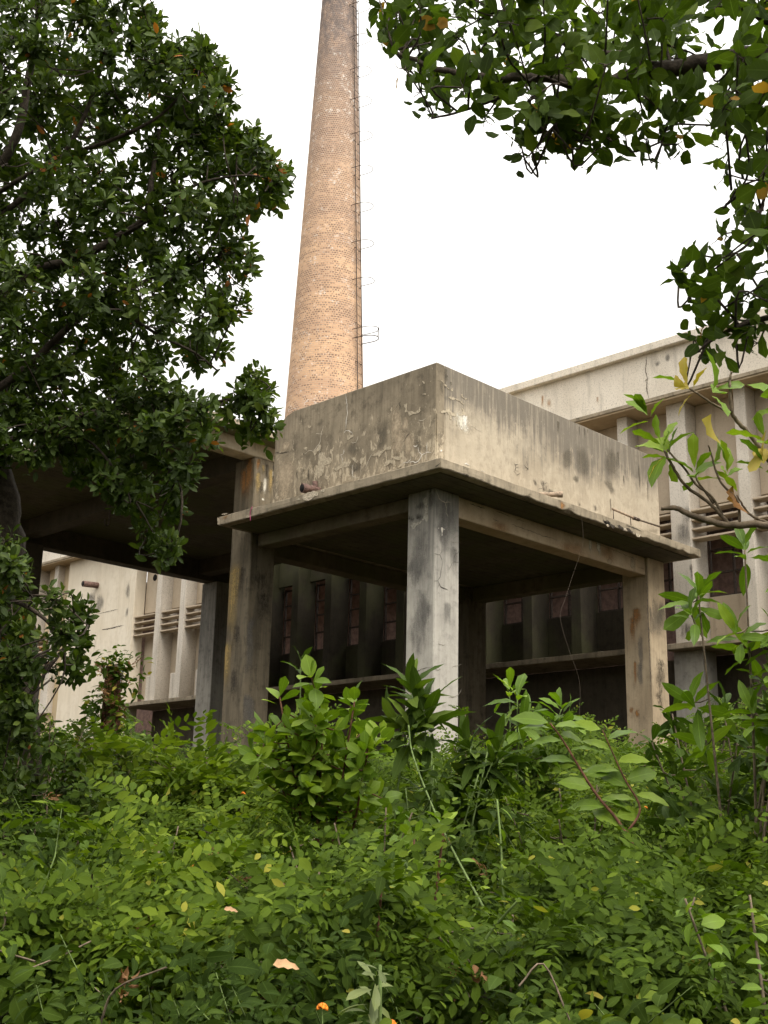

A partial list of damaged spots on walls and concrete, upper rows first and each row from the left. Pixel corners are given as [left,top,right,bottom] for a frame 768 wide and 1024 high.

peeling [297,404,420,501]
leakage [457,415,468,430]